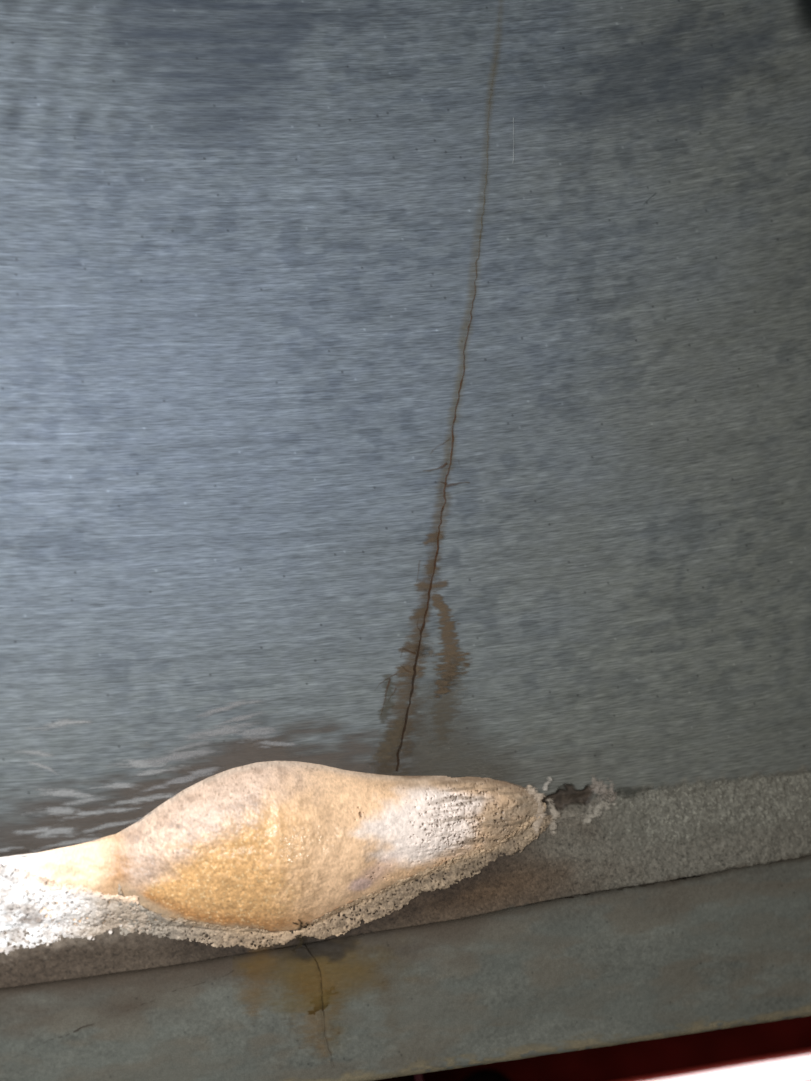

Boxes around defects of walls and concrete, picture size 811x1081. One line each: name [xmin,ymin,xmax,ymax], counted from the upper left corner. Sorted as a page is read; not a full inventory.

crack [387,200,485,771]
peeling [17,701,293,846]
leakage [412,724,503,781]